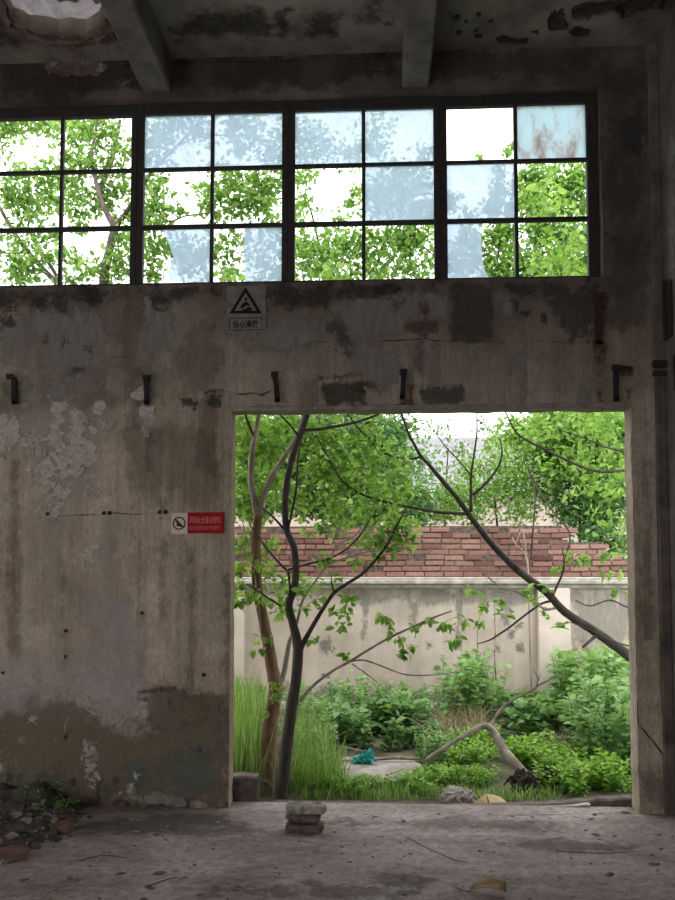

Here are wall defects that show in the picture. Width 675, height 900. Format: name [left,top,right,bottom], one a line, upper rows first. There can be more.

water stain [168,5,293,42]
peeling [496,0,675,44]
flaking render [44,61,108,79]
water stain [239,282,547,406]
peeling [130,385,144,401]
peeling [0,395,130,522]
crack [58,510,155,518]
flaking render [79,738,101,790]
water stain [0,672,229,835]